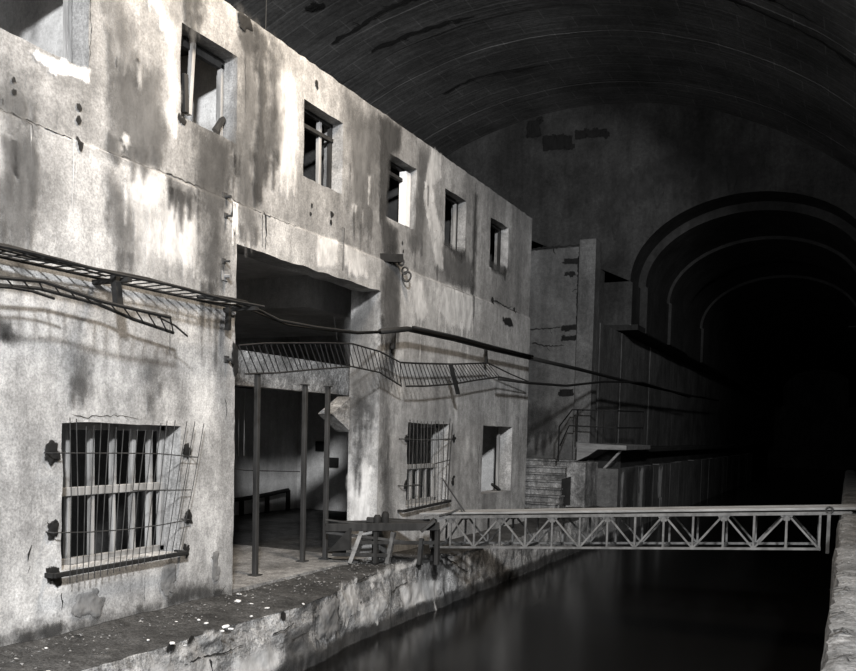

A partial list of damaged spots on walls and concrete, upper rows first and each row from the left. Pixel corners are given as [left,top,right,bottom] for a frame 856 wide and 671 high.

crack [331,0,410,44]
crack [371,16,474,52]
crack [728,0,856,68]
crack [0,108,70,138]
crack [107,151,201,200]
water stain [107,0,299,331]
crack [232,199,296,249]
flaking render [71,588,106,618]